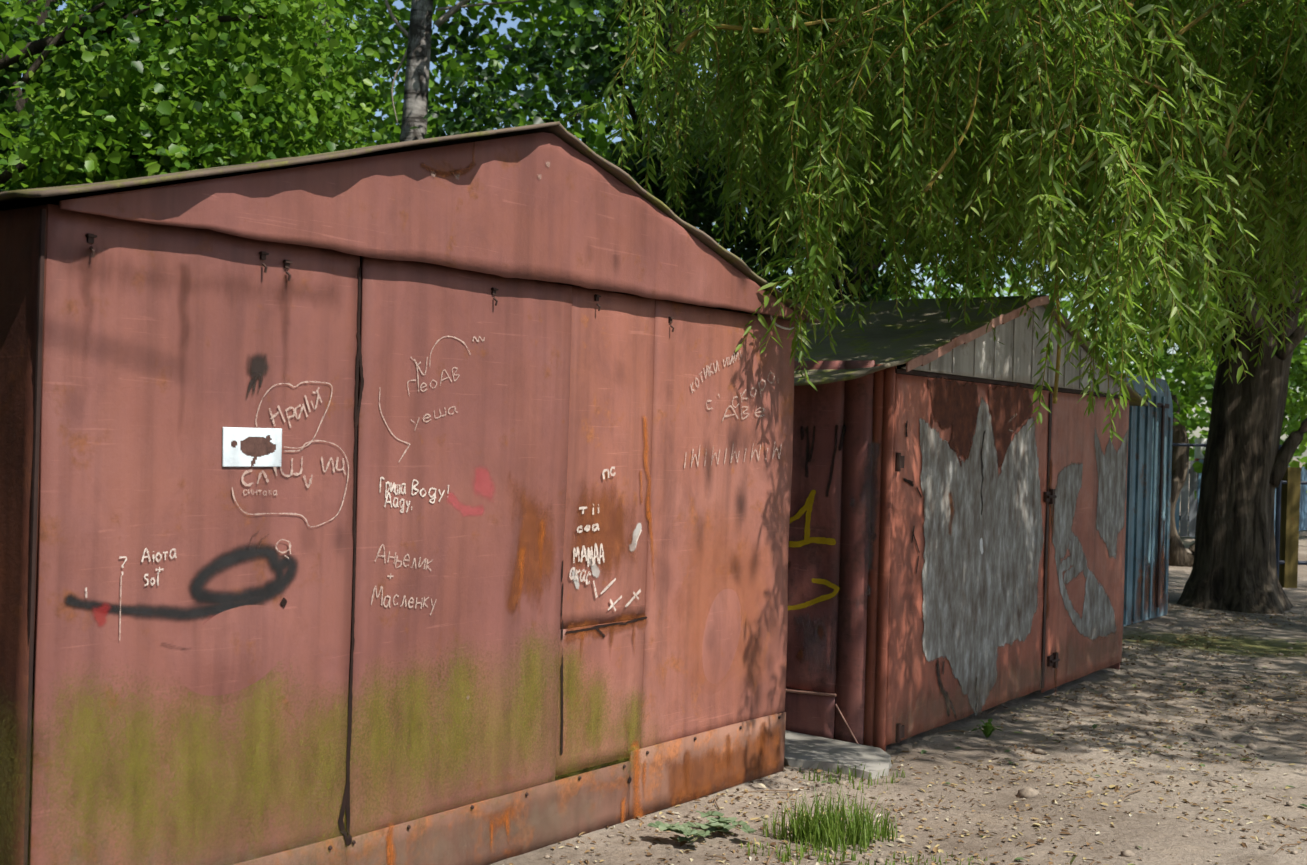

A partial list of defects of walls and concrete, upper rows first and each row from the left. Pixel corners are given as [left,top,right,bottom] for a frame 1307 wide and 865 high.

peeling [927,377,1033,515]
corrosion [621,743,646,823]
corrosion [670,724,780,801]
corrosion [387,828,395,865]